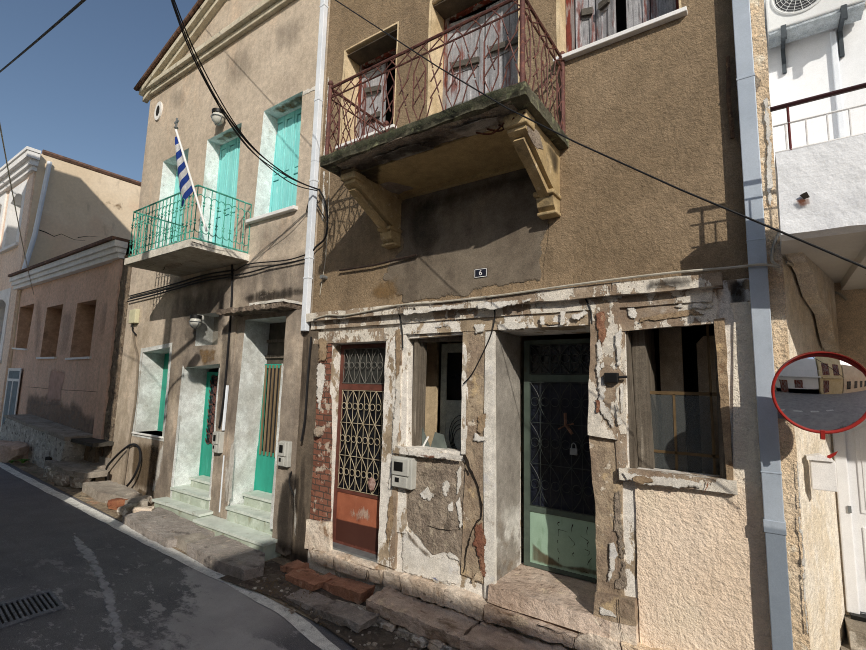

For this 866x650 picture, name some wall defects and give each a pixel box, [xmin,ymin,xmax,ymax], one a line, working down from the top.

leakage [336,136,445,184]
peeling [403,304,464,315]
peeling [477,298,531,310]
peeling [498,321,527,330]
peeling [627,302,713,323]
leakage [26,397,94,434]
flaking render [311,337,333,520]
peeling [386,329,419,545]
peeling [623,472,702,488]
flaking render [401,451,466,584]
spalling [473,523,486,577]
peeling [608,491,628,590]